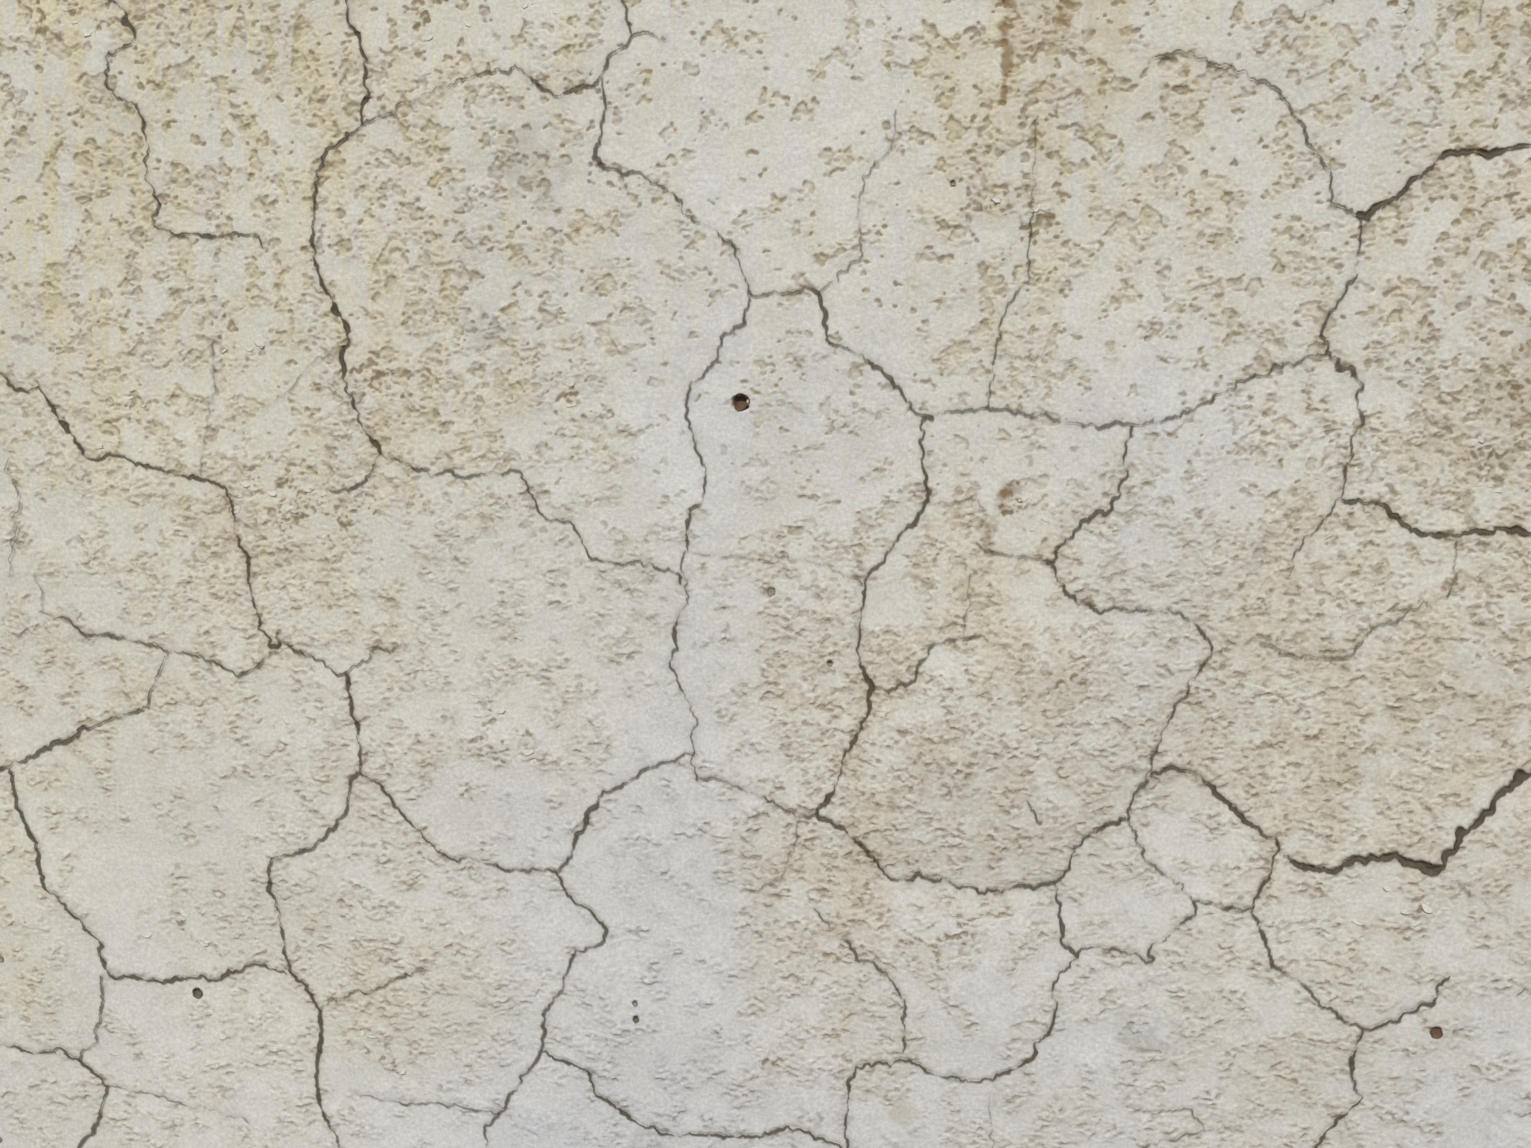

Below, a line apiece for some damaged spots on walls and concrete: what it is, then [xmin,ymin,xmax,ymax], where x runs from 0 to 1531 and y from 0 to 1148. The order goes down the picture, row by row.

crack [104,0,262,246]
crack [309,0,697,492]
crack [1155,49,1531,253]
crack [0,230,1531,1148]